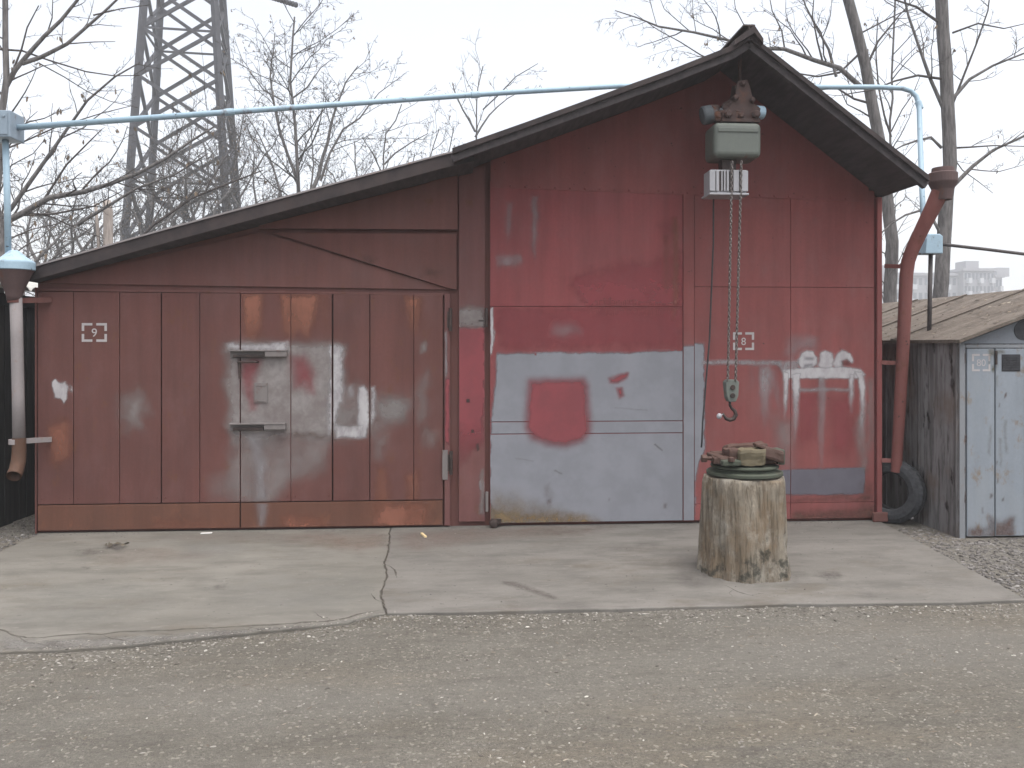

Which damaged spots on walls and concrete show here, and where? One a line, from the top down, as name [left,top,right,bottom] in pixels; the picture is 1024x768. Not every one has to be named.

corrosion [244,294,262,336]
corrosion [281,294,317,334]
corrosion [375,504,425,526]
crack [0,533,397,646]